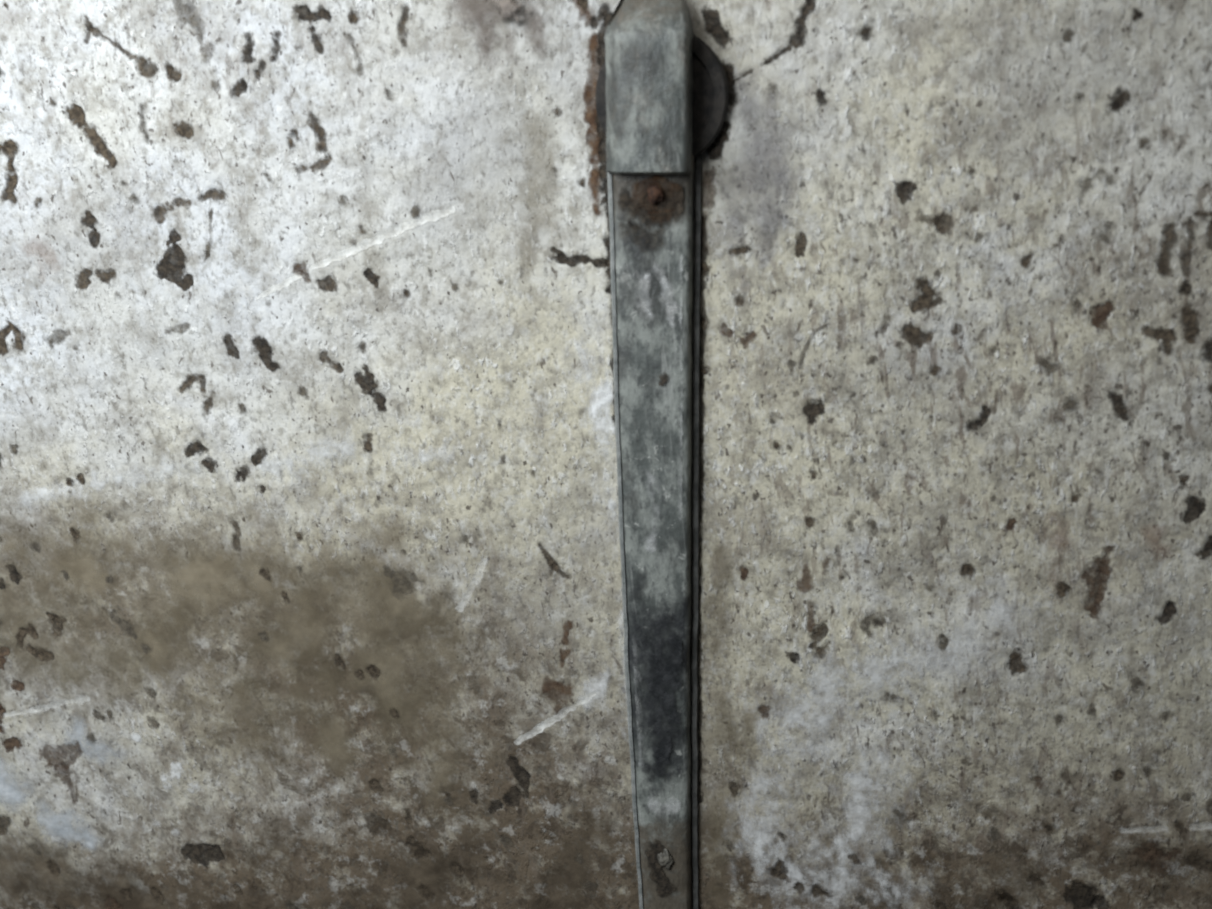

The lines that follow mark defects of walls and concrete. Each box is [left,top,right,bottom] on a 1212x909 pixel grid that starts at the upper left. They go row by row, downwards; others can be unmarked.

corrosion [575,0,601,215]
damp [143,546,454,722]
damp [538,714,562,730]
damp [584,674,608,702]
damp [785,659,842,728]
damp [162,763,181,788]
damp [783,753,890,905]
damp [0,845,82,903]